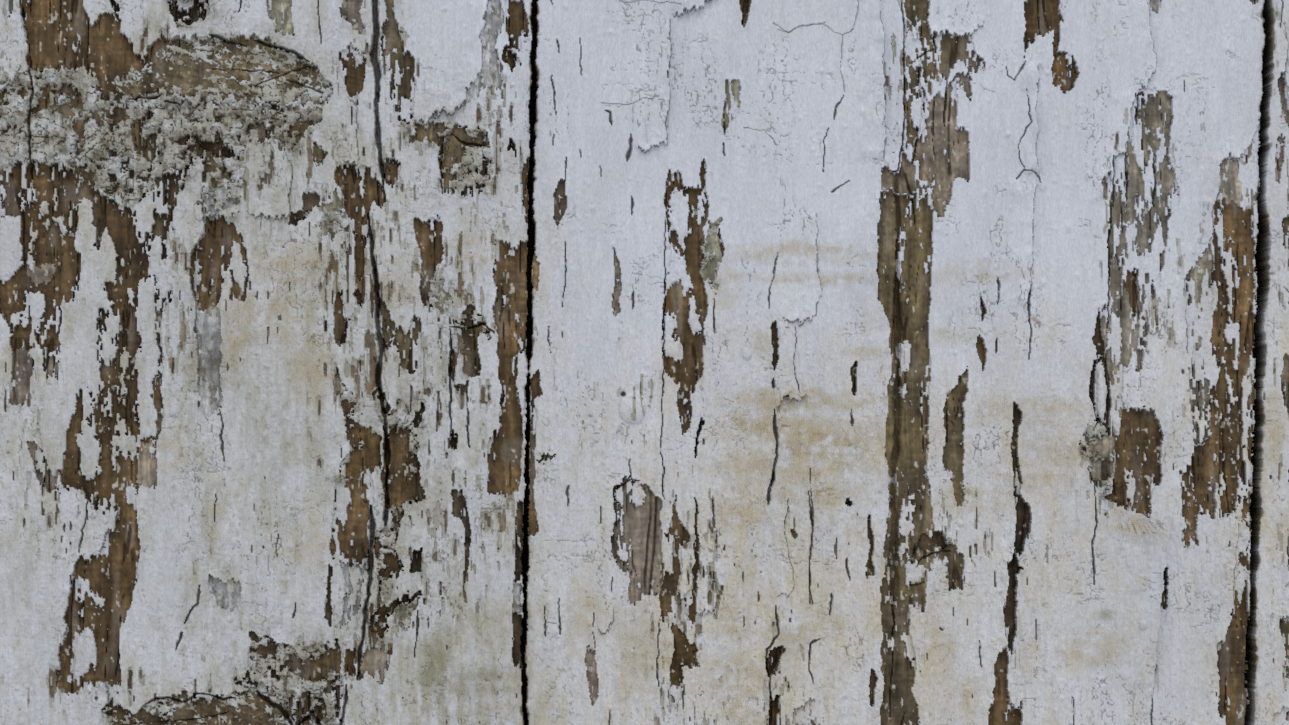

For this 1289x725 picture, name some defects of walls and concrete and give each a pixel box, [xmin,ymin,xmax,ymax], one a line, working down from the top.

peeling [381,0,528,196]
crack [618,0,682,8]
crack [1006,61,1041,183]
peeling [0,0,425,725]
peeling [380,219,552,668]
peeling [662,162,724,454]
crack [766,252,801,505]
peeling [853,0,985,725]
peeling [1079,89,1258,725]
peeling [611,479,717,702]
crack [764,605,780,725]
crack [808,468,851,684]